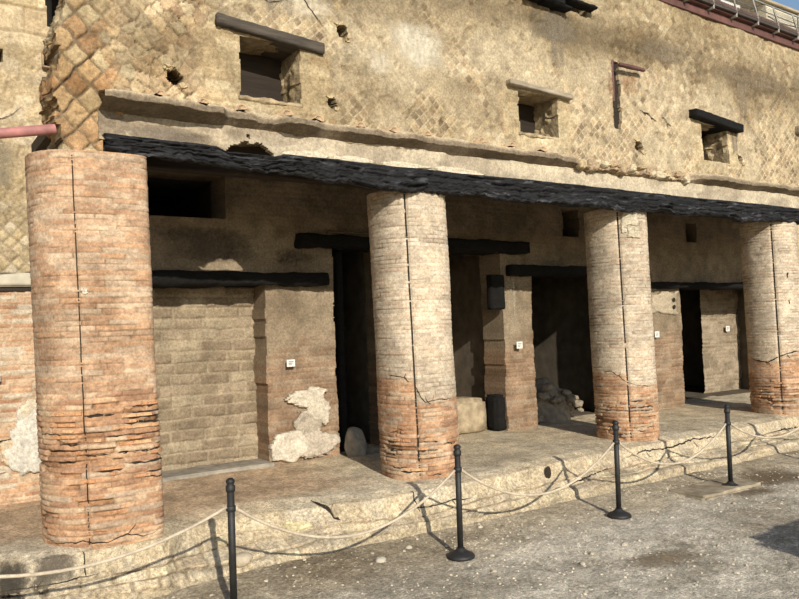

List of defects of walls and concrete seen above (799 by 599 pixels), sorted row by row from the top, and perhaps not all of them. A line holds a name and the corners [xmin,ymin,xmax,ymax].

crack [753,351,799,365]
crack [391,374,451,404]
spalling [0,399,162,484]
crack [556,436,721,489]